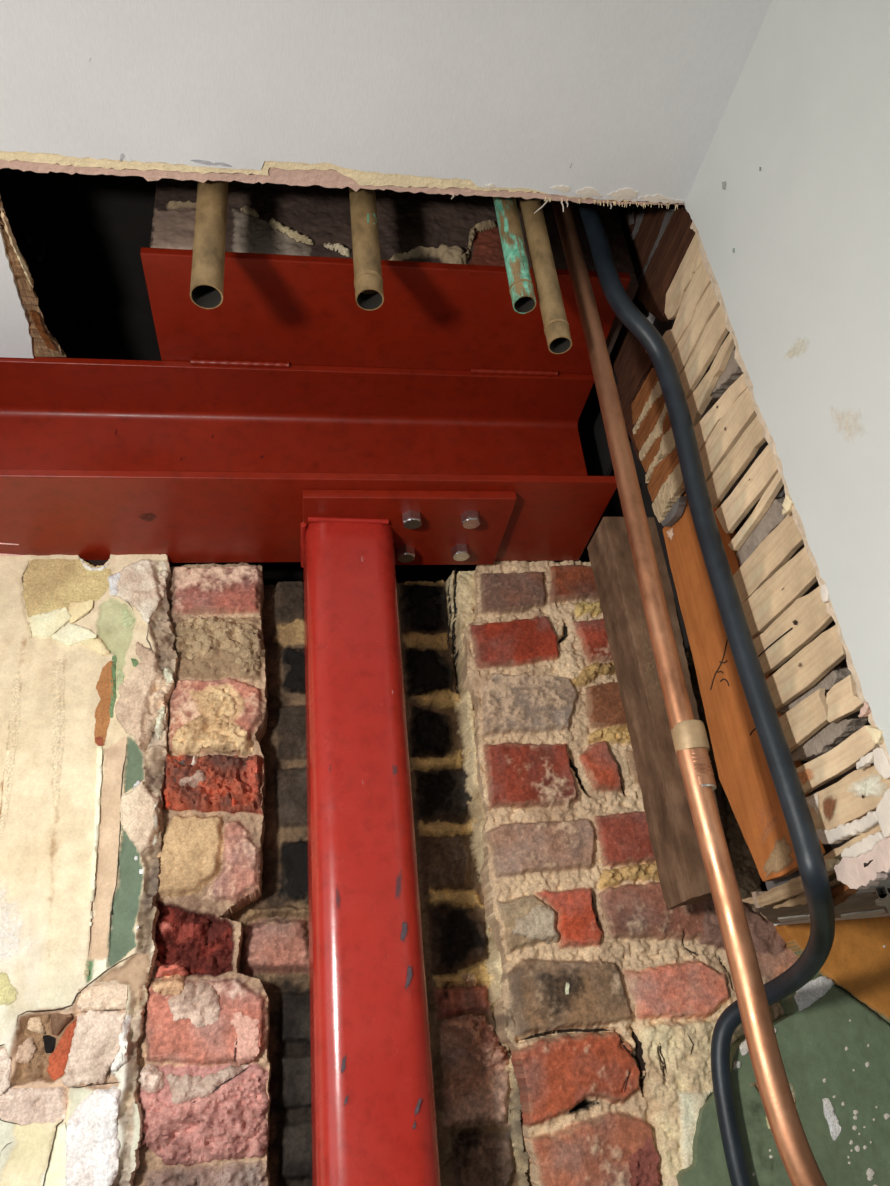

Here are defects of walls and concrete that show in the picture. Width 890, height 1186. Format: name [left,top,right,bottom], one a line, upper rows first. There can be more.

spalling [690,222,890,913]
crack [558,622,568,643]
spalling [28,559,265,874]
crack [569,758,585,793]
crack [682,935,733,989]
spalling [0,982,133,1186]
spalling [137,1063,269,1166]
crack [516,1027,694,1093]